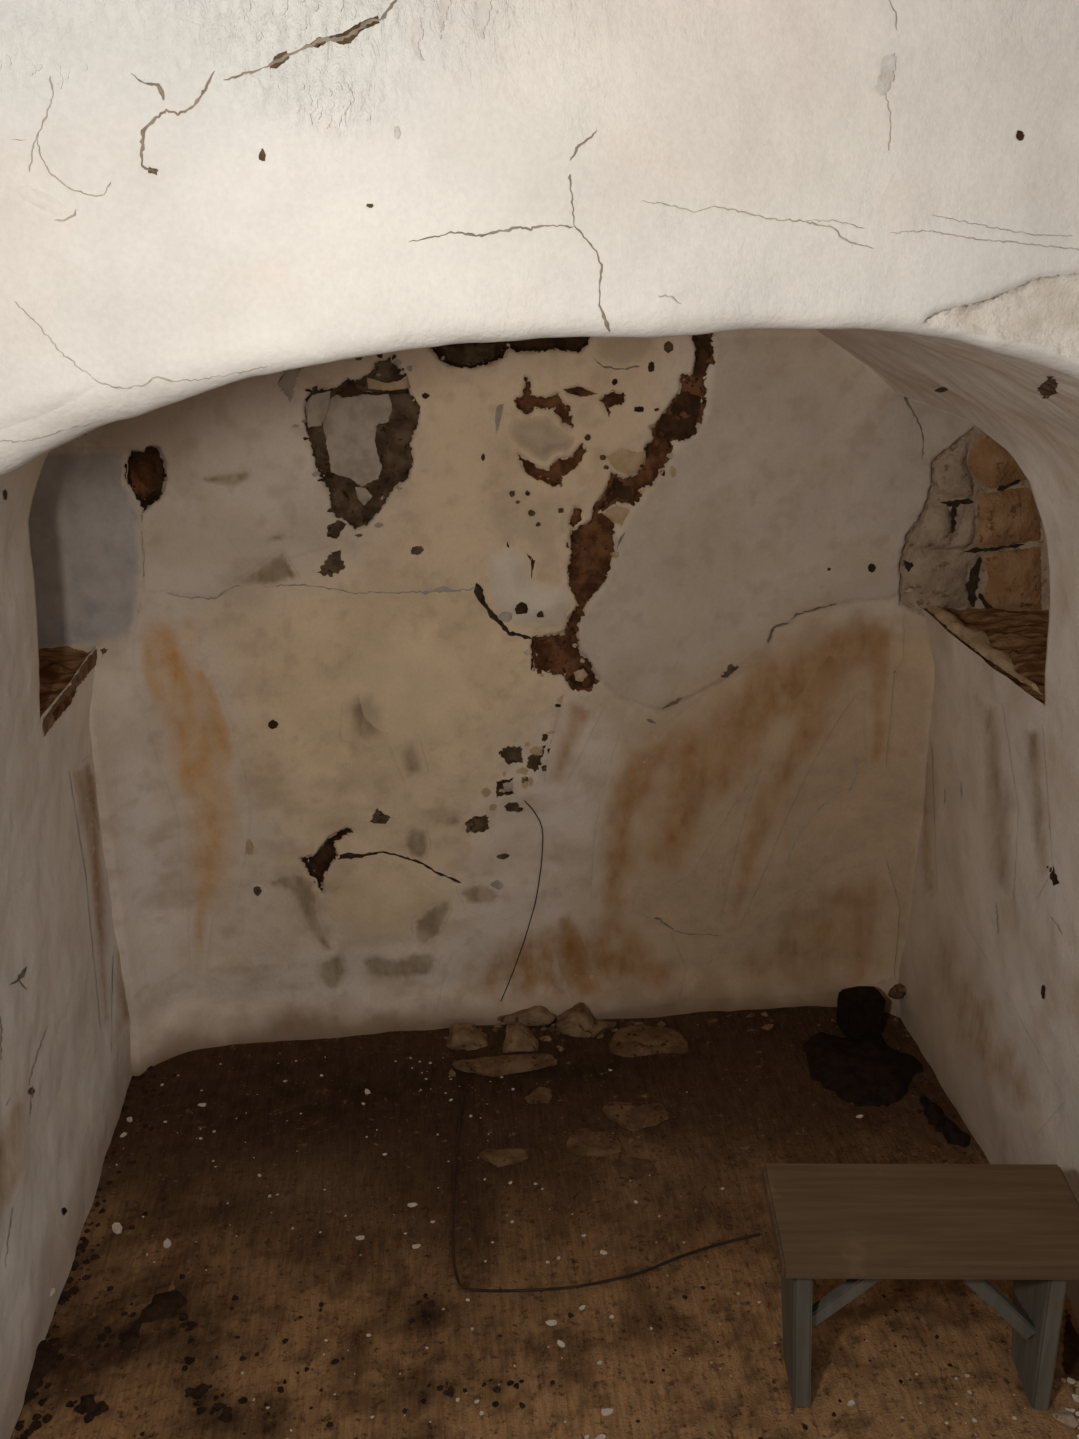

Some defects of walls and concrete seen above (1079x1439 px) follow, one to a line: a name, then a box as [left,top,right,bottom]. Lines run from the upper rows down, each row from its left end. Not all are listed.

crack [13,77,111,222]
crack [132,0,396,175]
crack [409,131,610,332]
spalling [279,354,430,577]
spalling [431,333,716,707]
spalling [899,428,1049,695]
spalling [1037,376,1057,399]
rust [133,612,250,974]
spalling [465,731,555,833]